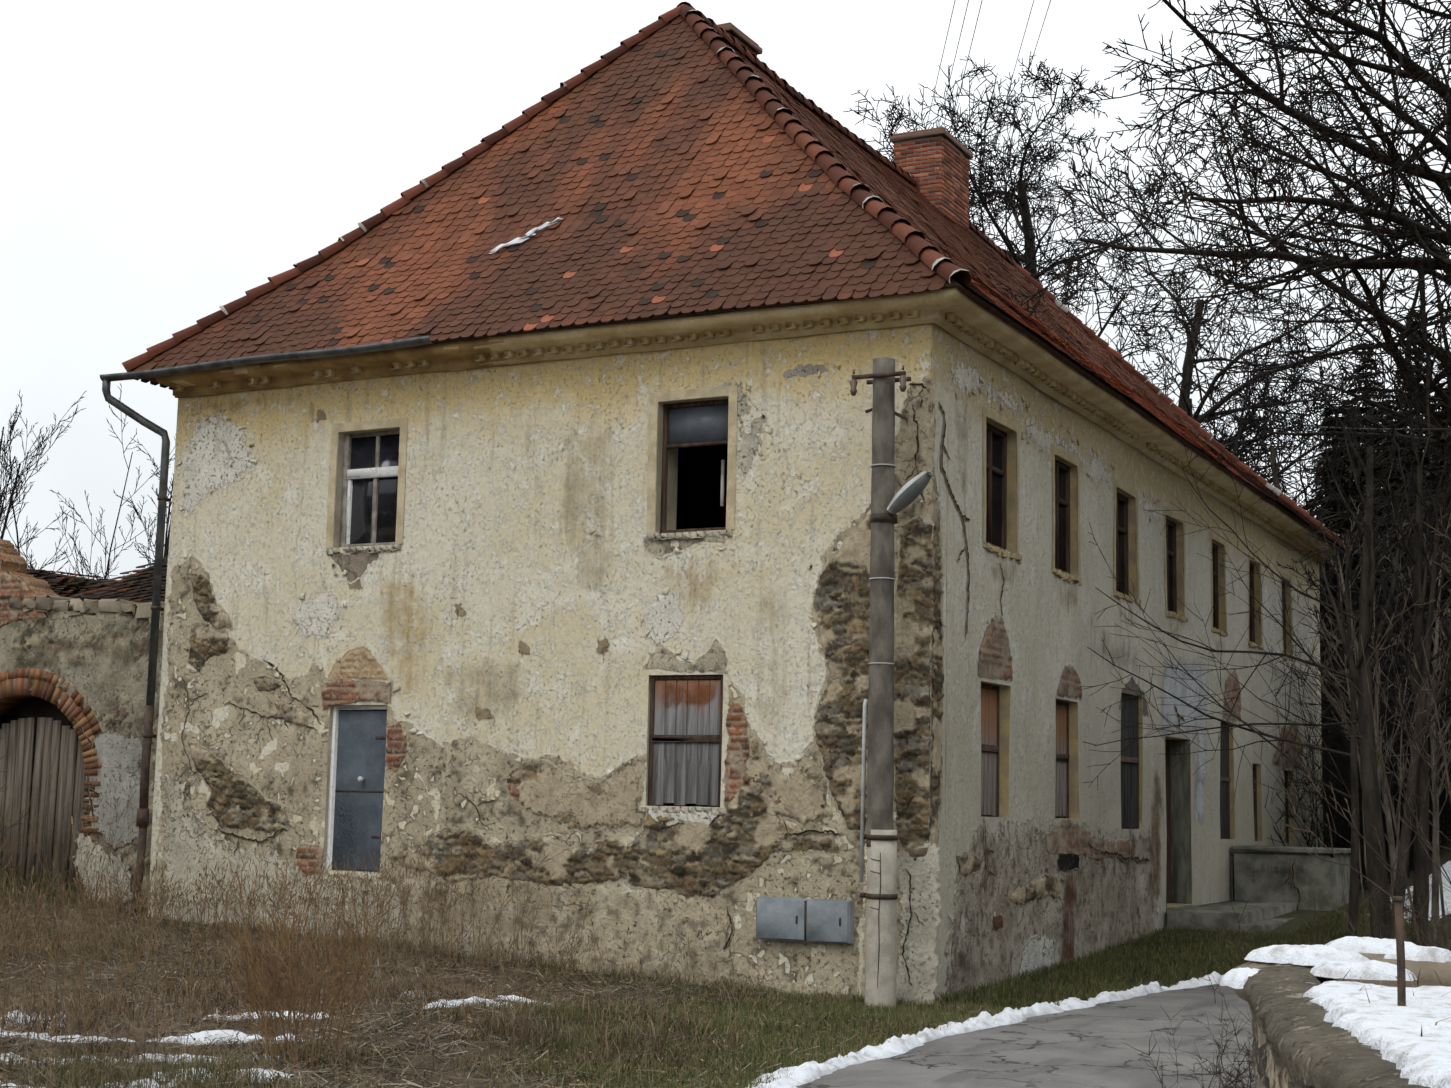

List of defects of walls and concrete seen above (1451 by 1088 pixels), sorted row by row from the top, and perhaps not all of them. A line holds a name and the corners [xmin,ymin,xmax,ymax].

crack [905,383,1005,638]
peeling [950,360,1164,528]
flaking render [86,504,871,1000]
flaking render [893,366,945,973]
flaking render [976,610,1013,682]
flaking render [1056,662,1082,699]
spalling [932,814,1162,1002]